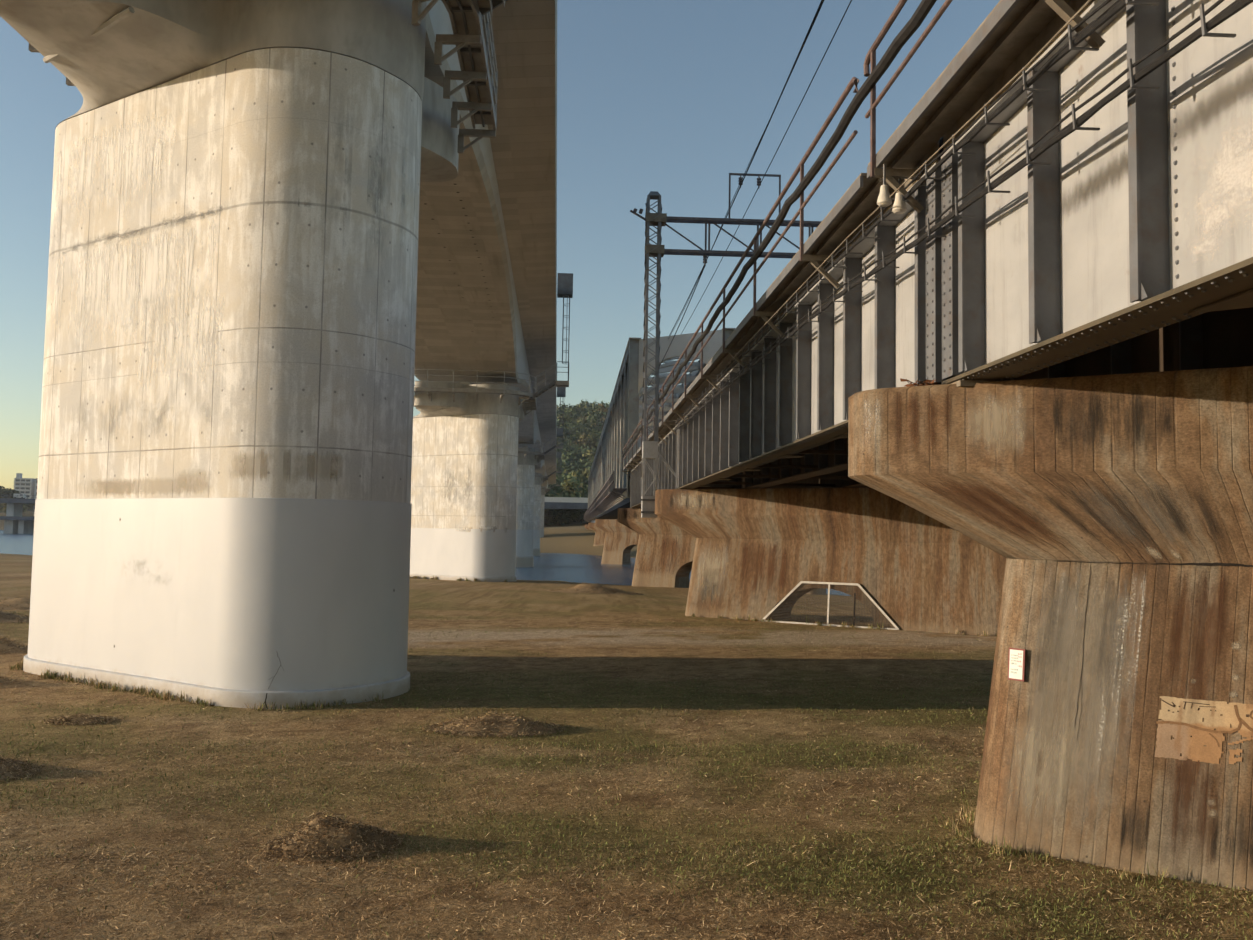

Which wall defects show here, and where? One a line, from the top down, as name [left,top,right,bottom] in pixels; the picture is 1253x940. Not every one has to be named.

water stain [1053,401,1142,441]